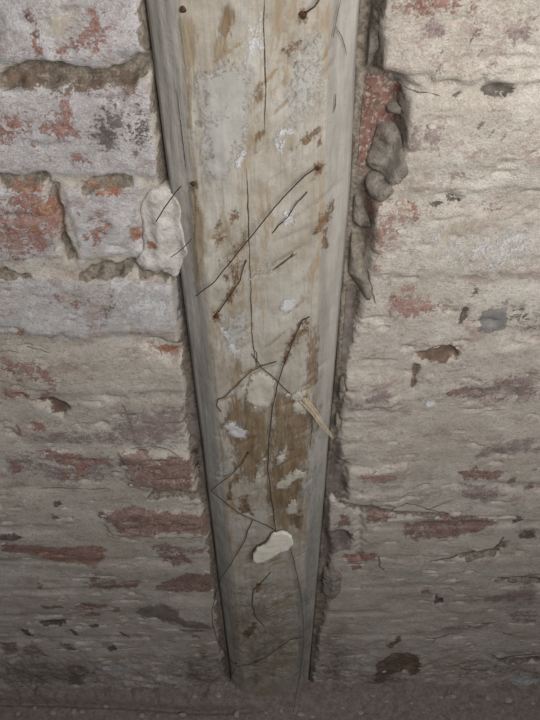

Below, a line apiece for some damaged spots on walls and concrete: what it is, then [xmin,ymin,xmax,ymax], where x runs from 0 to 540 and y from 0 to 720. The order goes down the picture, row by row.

crack [247,181,257,362]
spalling [477,299,540,334]
spalling [411,345,460,388]
peeling [221,353,320,564]
rust [227,474,254,515]
crack [430,537,512,562]
spalling [374,636,422,681]